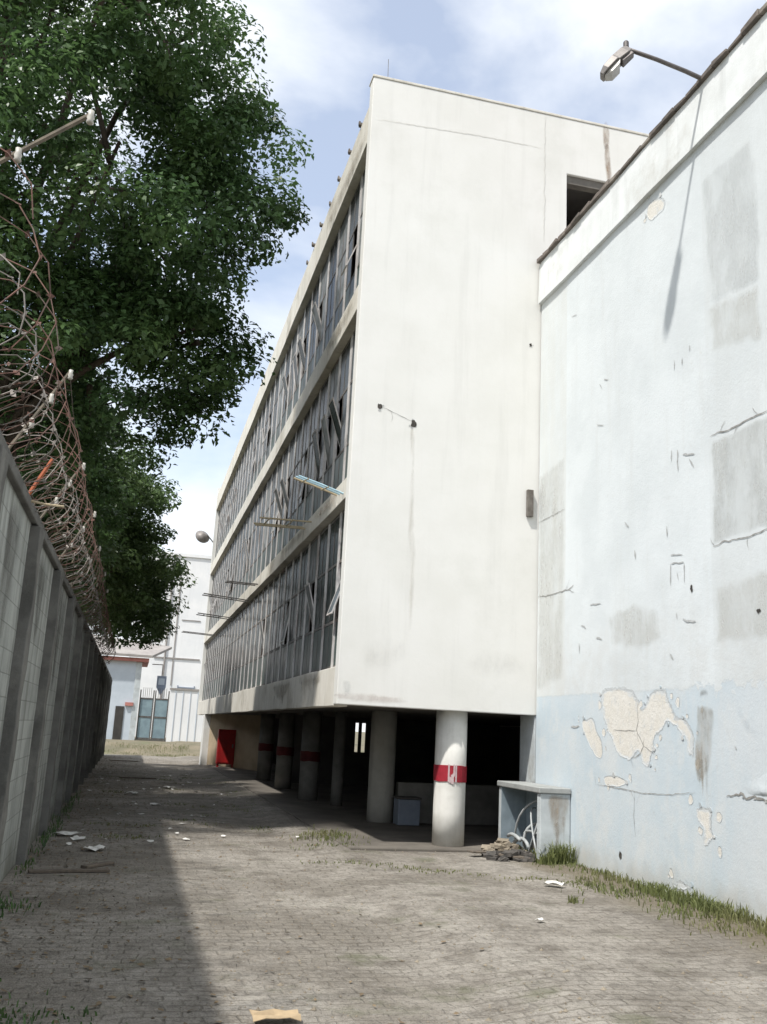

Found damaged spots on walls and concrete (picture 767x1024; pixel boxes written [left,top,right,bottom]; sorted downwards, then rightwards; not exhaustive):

peeling [643,193,665,223]
crack [710,409,766,437]
crack [711,518,767,550]
peeling [578,686,699,771]